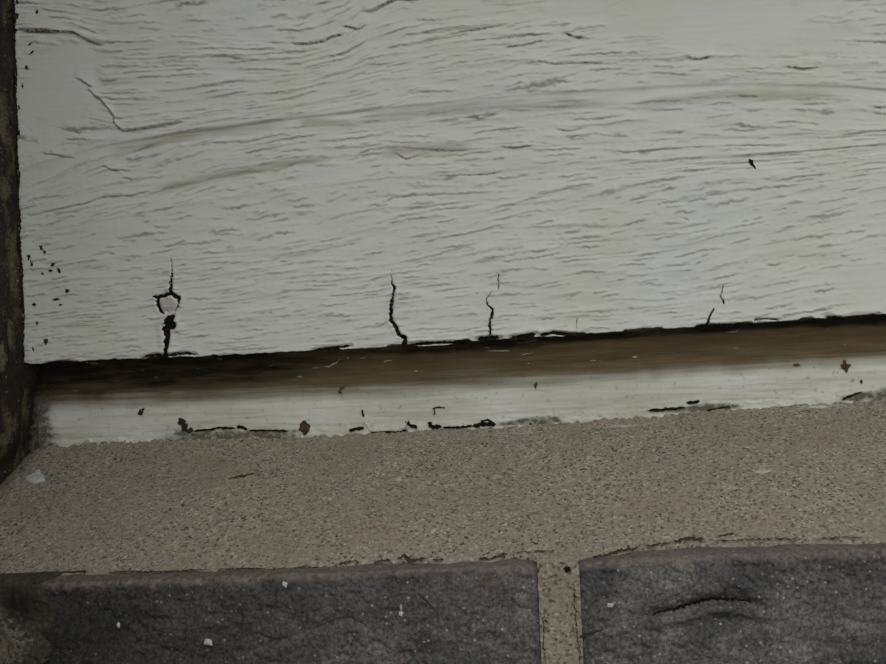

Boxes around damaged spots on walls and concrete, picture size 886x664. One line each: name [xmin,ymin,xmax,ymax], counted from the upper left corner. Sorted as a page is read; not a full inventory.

crack [298,0,412,45]
crack [153,257,181,356]
crack [381,270,407,348]
crack [486,274,500,338]
damp [404,314,886,353]
damp [37,353,315,390]
peeling [177,418,194,434]
peeling [299,420,310,436]